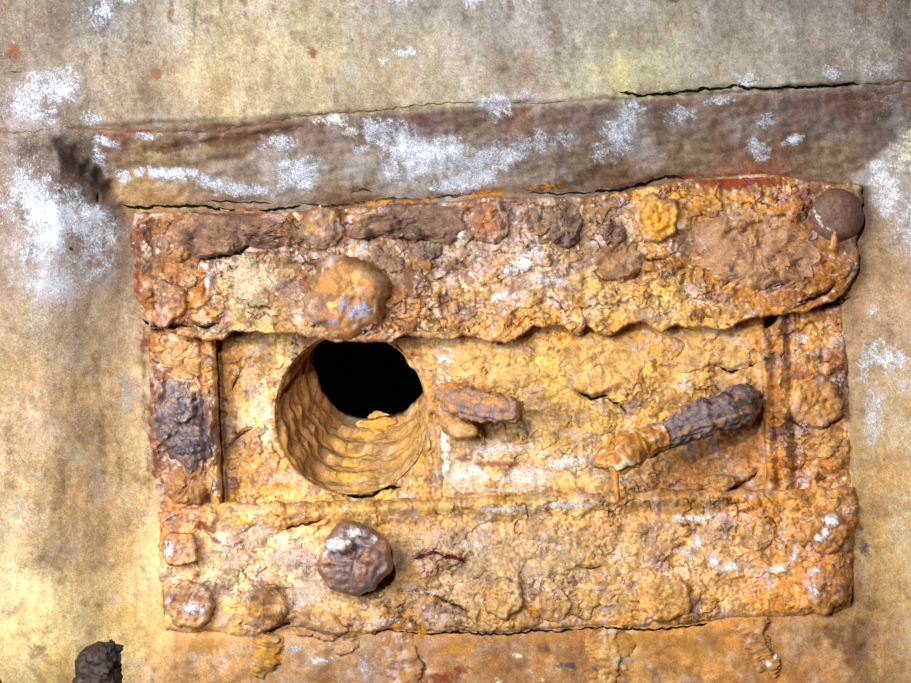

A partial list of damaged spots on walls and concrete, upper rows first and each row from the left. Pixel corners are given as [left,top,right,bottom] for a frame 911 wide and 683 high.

crack [619,79,911,102]
damp [115,135,319,197]
damp [313,113,572,192]
damp [868,130,911,252]
damp [2,171,116,344]
corrosion [338,199,465,294]
corrosion [680,208,821,291]
corrosion [140,328,215,505]
corrosion [355,411,398,434]
corrosion [439,336,540,393]
corrosion [562,327,751,396]
damp [856,338,911,450]